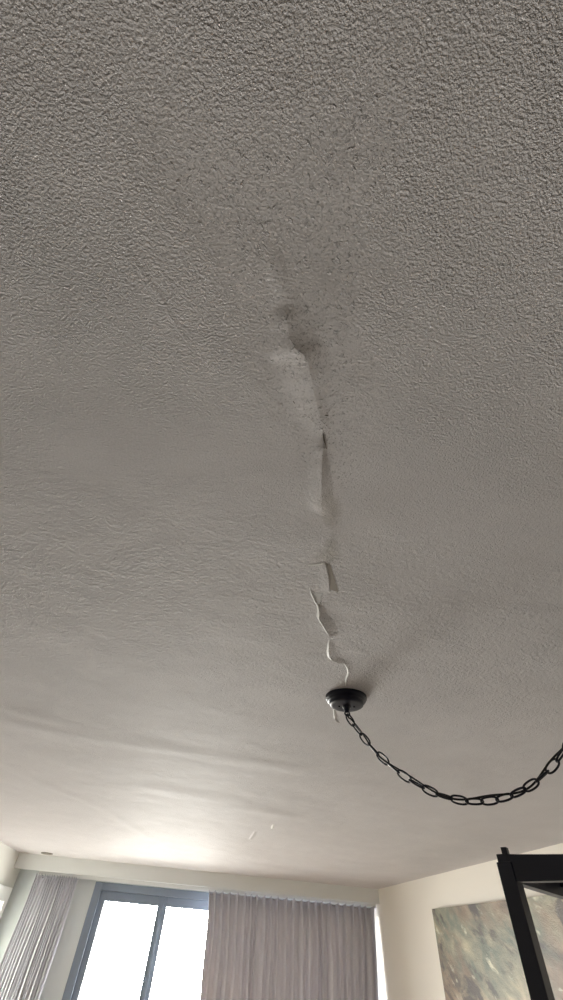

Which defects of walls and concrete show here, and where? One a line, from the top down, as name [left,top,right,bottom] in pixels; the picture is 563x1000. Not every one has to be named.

crack [309,588,371,686]